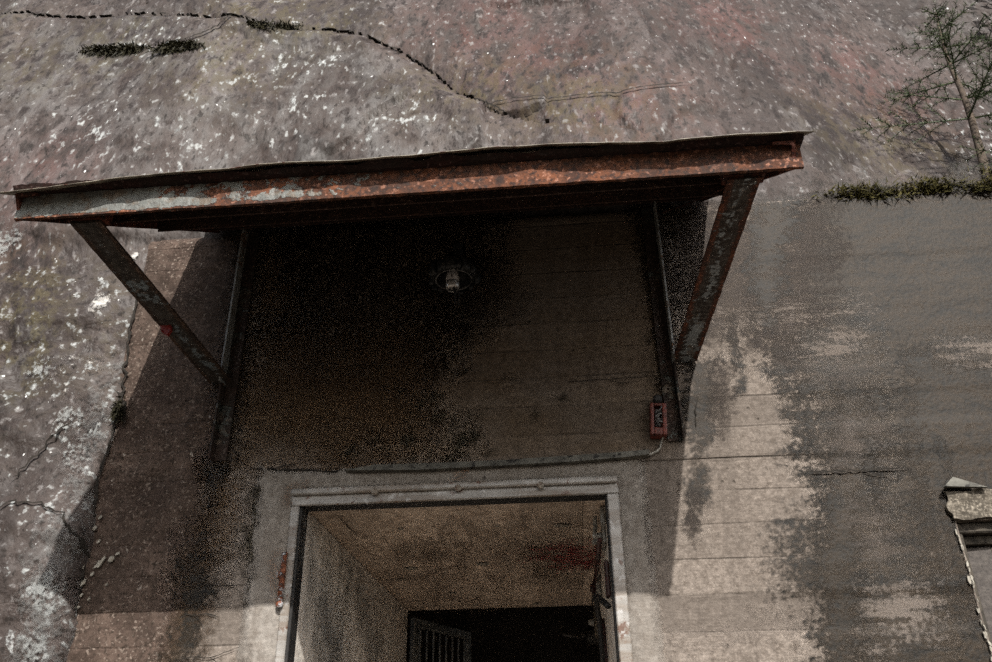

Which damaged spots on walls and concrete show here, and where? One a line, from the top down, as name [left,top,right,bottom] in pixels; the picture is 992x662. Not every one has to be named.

leakage [666,197,722,315]
leakage [251,316,480,465]
leakage [676,163,992,662]